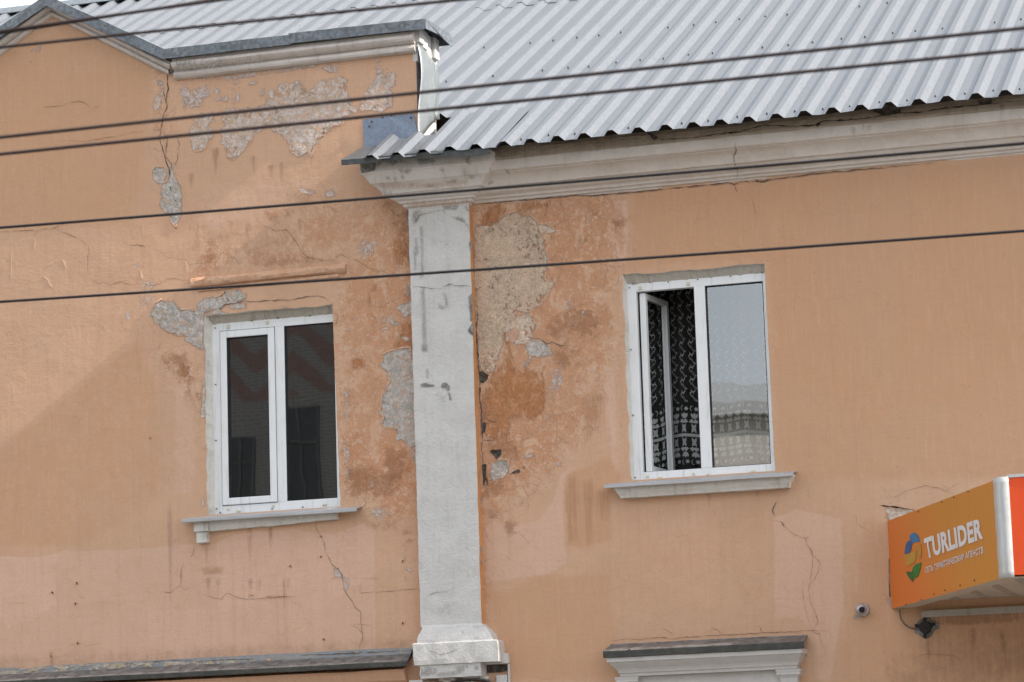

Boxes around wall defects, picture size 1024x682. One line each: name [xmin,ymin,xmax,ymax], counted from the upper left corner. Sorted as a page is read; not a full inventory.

crack [62,69,180,210]
peeling [179,59,396,161]
spalling [150,289,247,418]
spalling [378,336,451,466]
spalling [468,211,557,392]
spalling [482,450,533,485]
crack [301,522,455,656]
crack [613,503,826,651]
crack [128,657,253,665]